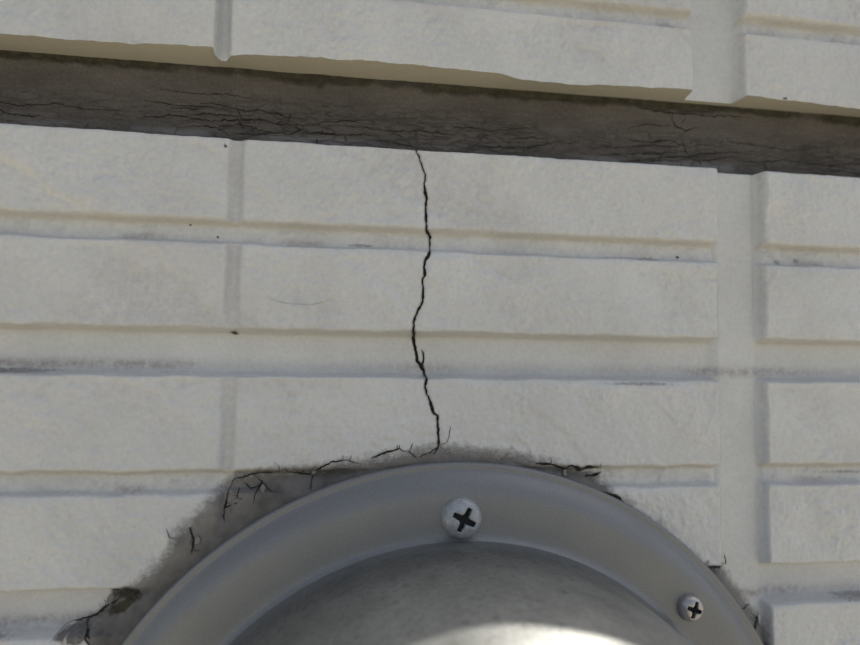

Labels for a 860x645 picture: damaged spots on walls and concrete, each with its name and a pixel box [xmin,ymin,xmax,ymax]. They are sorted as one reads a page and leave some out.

crack [0,89,860,519]
crack [166,527,200,554]
crack [75,594,121,645]